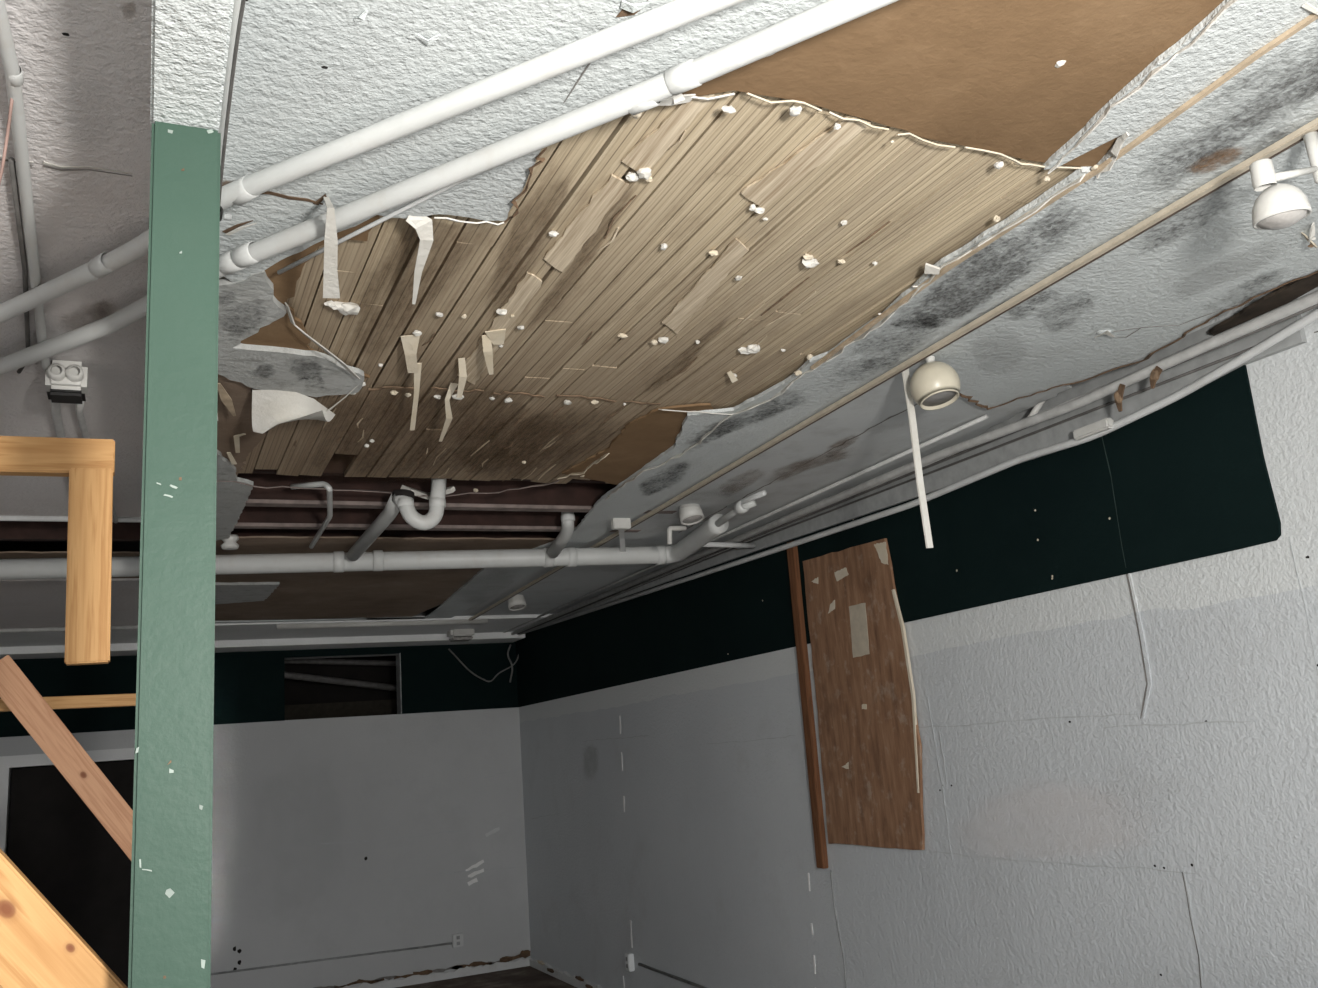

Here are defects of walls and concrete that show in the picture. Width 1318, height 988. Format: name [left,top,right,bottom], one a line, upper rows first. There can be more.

peeling [217,383,236,421]
peeling [227,302,366,465]
peeling [323,197,360,316]
peeling [390,330,467,442]
peeling [406,148,547,304]
peeling [482,308,524,375]
peeling [605,0,1237,500]
water stain [863,240,1029,371]
spalling [959,271,1318,410]
spalling [1301,222,1317,248]
peeling [219,481,392,493]
peeling [414,453,610,497]